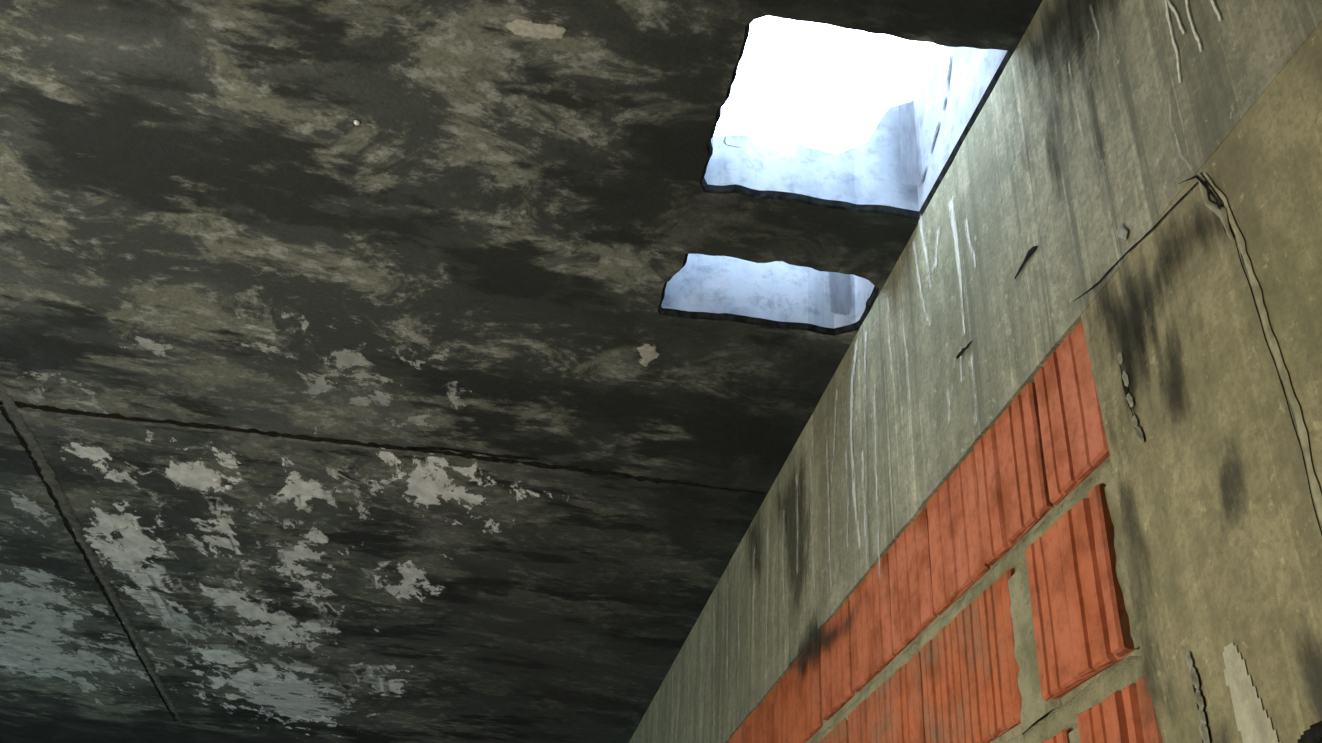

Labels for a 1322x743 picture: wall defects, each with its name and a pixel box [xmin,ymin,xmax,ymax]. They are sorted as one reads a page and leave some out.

leakage [1029,0,1100,76]
leakage [1164,0,1201,84]
crack [1072,172,1322,536]
peeling [0,429,552,739]
crack [0,382,764,722]
leakage [1121,484,1143,554]
leakage [1221,453,1242,516]
leakage [1304,645,1322,721]